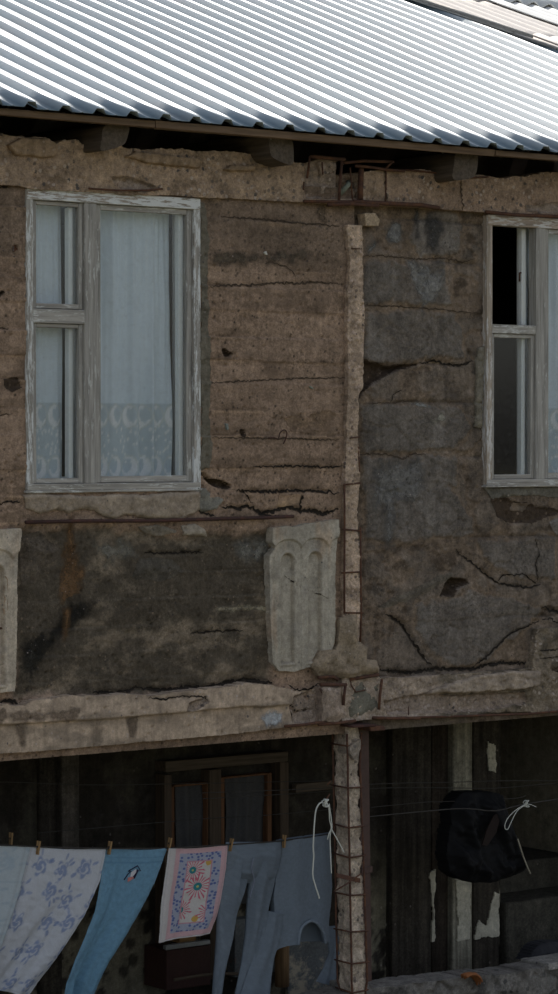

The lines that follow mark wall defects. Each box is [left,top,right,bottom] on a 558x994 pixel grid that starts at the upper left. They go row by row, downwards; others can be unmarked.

spalling [483,487,558,524]
leakage [23,603,91,673]
spalling [440,577,469,597]
crack [379,539,558,675]
spalling [284,667,558,994]